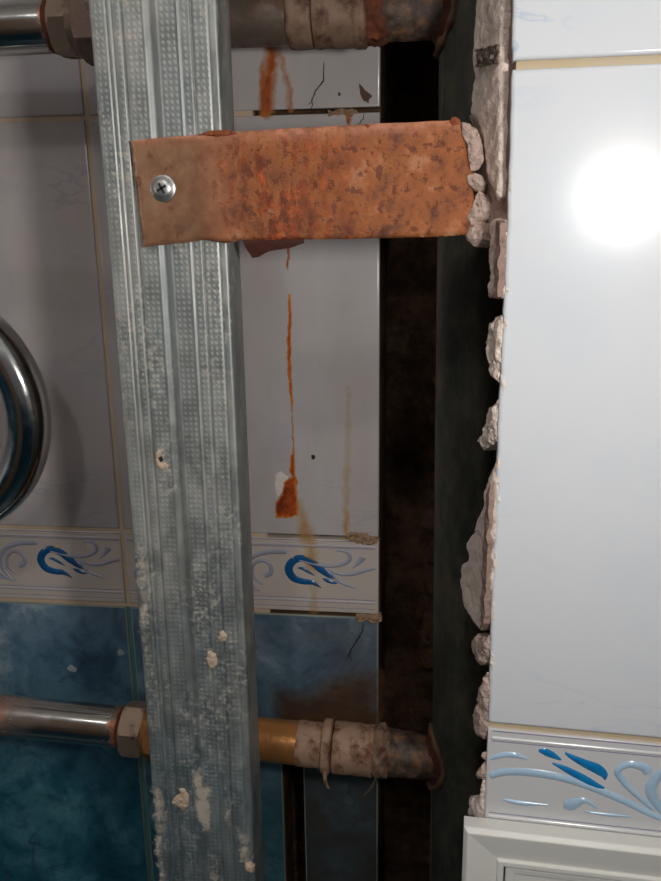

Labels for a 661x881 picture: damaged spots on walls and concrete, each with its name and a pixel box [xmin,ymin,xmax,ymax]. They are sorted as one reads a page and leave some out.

rust [260,47,277,117]
crack [309,62,324,110]
spalling [474,44,500,67]
spalling [461,116,509,299]
rust [275,294,298,518]
spalling [460,315,508,739]
crack [346,624,364,661]
spalling [468,752,487,818]